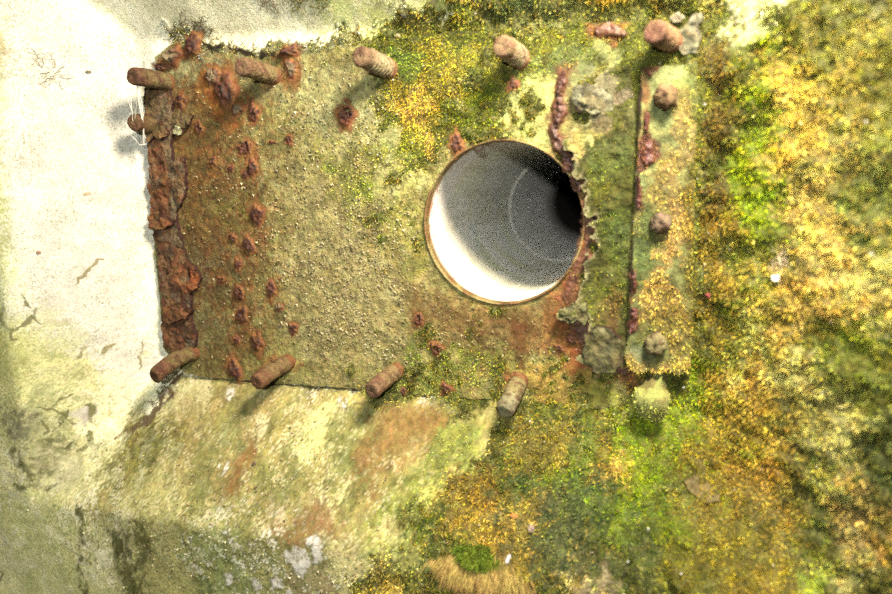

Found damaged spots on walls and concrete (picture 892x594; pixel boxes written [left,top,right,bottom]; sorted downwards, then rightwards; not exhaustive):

rust [146,60,264,183]
rust [641,111,657,166]
rust [147,214,177,231]
rust [547,70,595,375]
peeling [557,66,636,374]
crack [0,293,42,340]
rust [162,259,203,324]
rust [218,197,267,360]
rust [265,275,285,311]
rust [287,321,299,337]
rust [439,379,456,396]
rust [613,366,631,376]